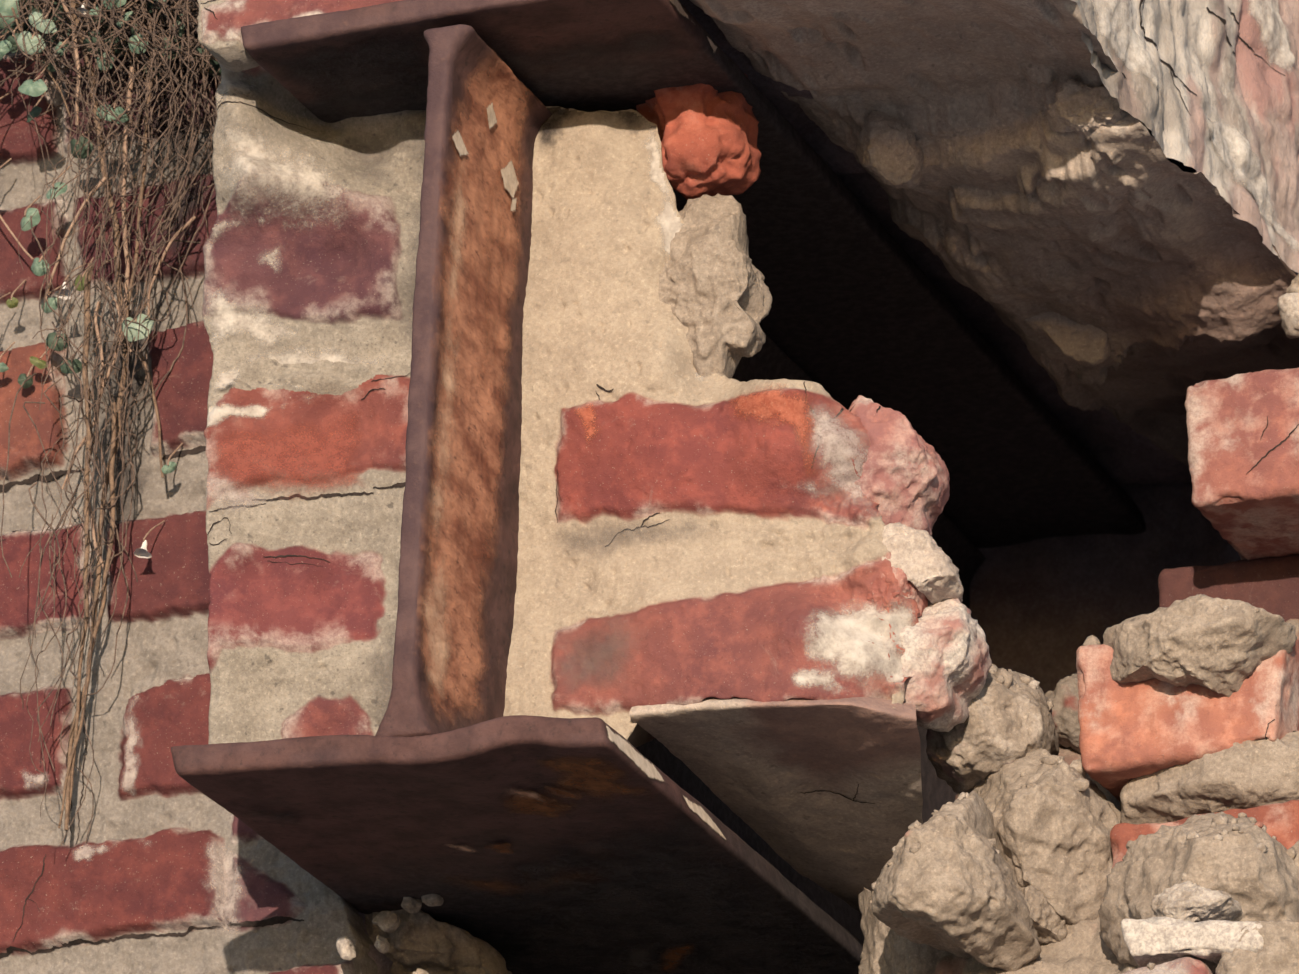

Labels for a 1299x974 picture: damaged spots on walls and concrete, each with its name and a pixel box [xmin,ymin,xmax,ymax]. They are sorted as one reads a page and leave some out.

spalling [636,83,761,201]
corrosion [422,61,528,716]
crack [0,468,84,493]
crack [162,446,206,460]
spalling [1158,368,1299,622]
crack [1247,416,1299,473]
leakage [794,606,913,687]
crack [66,716,87,845]
peeling [606,726,664,781]
peeling [683,796,726,840]
spalling [1076,639,1299,804]
crack [0,856,304,958]